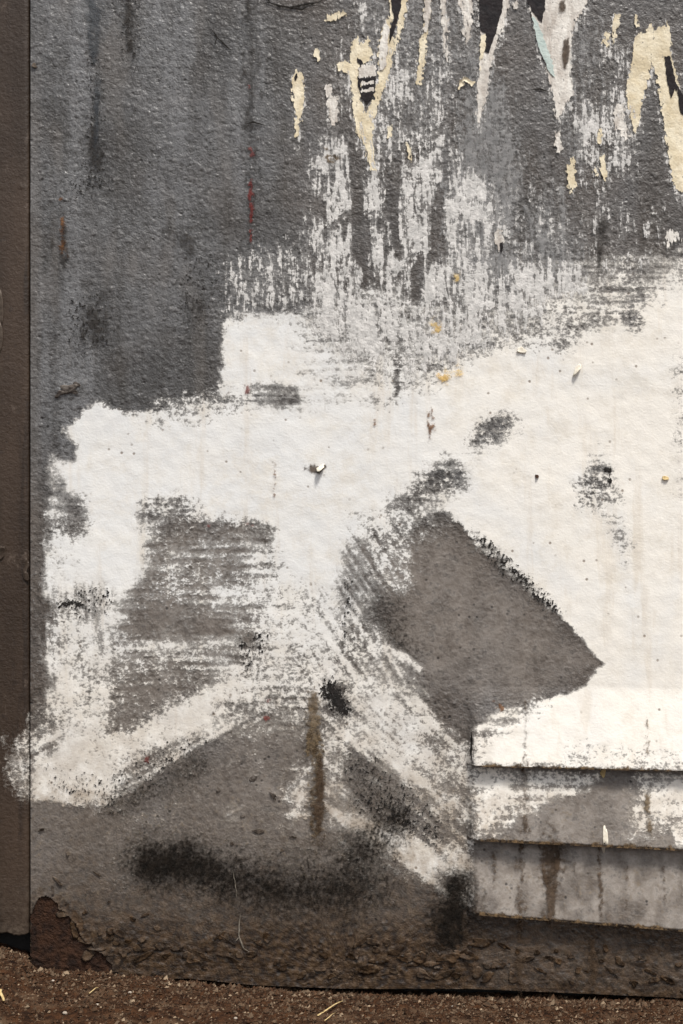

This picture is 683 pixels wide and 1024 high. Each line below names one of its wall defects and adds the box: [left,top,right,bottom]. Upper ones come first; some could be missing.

damp [305,686,326,837]
peeling [30,877,272,973]